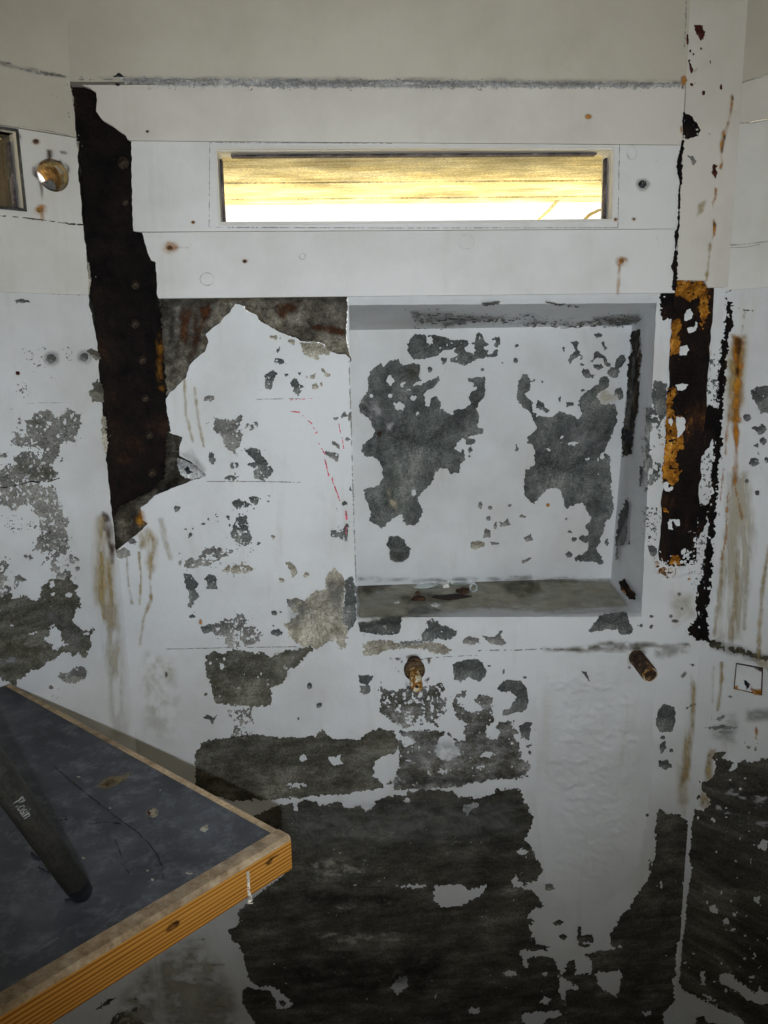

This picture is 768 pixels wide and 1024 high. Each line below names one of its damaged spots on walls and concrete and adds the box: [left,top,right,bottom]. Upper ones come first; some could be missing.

corrosion [711,123,728,194]
spalling [110,422,216,559]
peeling [206,414,273,481]
spalling [159,297,351,396]
peeling [325,302,668,565]
corrosion [661,387,689,486]
corrosion [669,318,682,356]
spalling [642,293,734,641]
corrosion [675,272,710,329]
corrosion [725,336,744,454]
peeling [0,408,95,698]
peeling [178,495,768,1024]